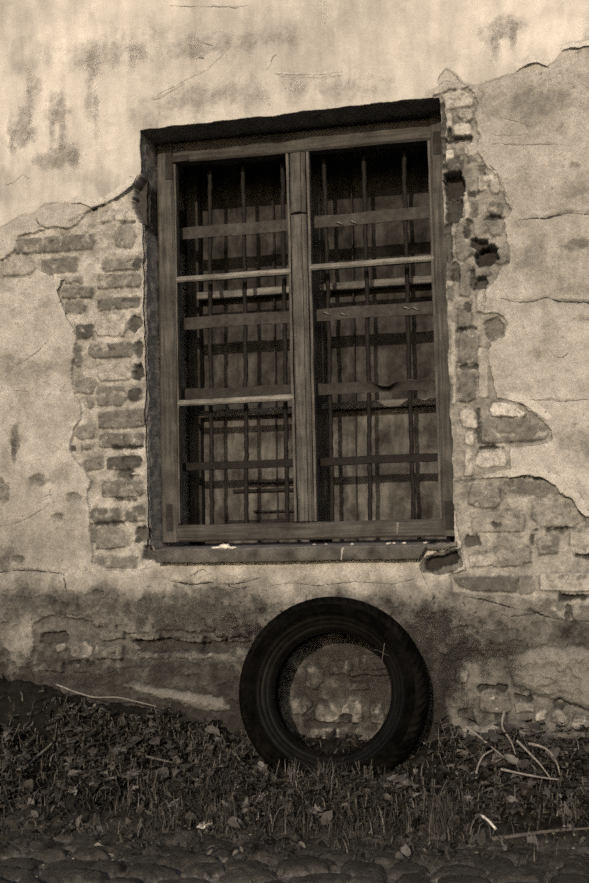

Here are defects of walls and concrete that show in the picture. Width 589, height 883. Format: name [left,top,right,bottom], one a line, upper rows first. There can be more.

peeling [513,55,552,71]
crack [501,296,589,304]
flaking render [0,171,156,572]
flaking render [420,86,589,625]
flaking render [26,614,257,680]
flaking render [443,651,589,737]